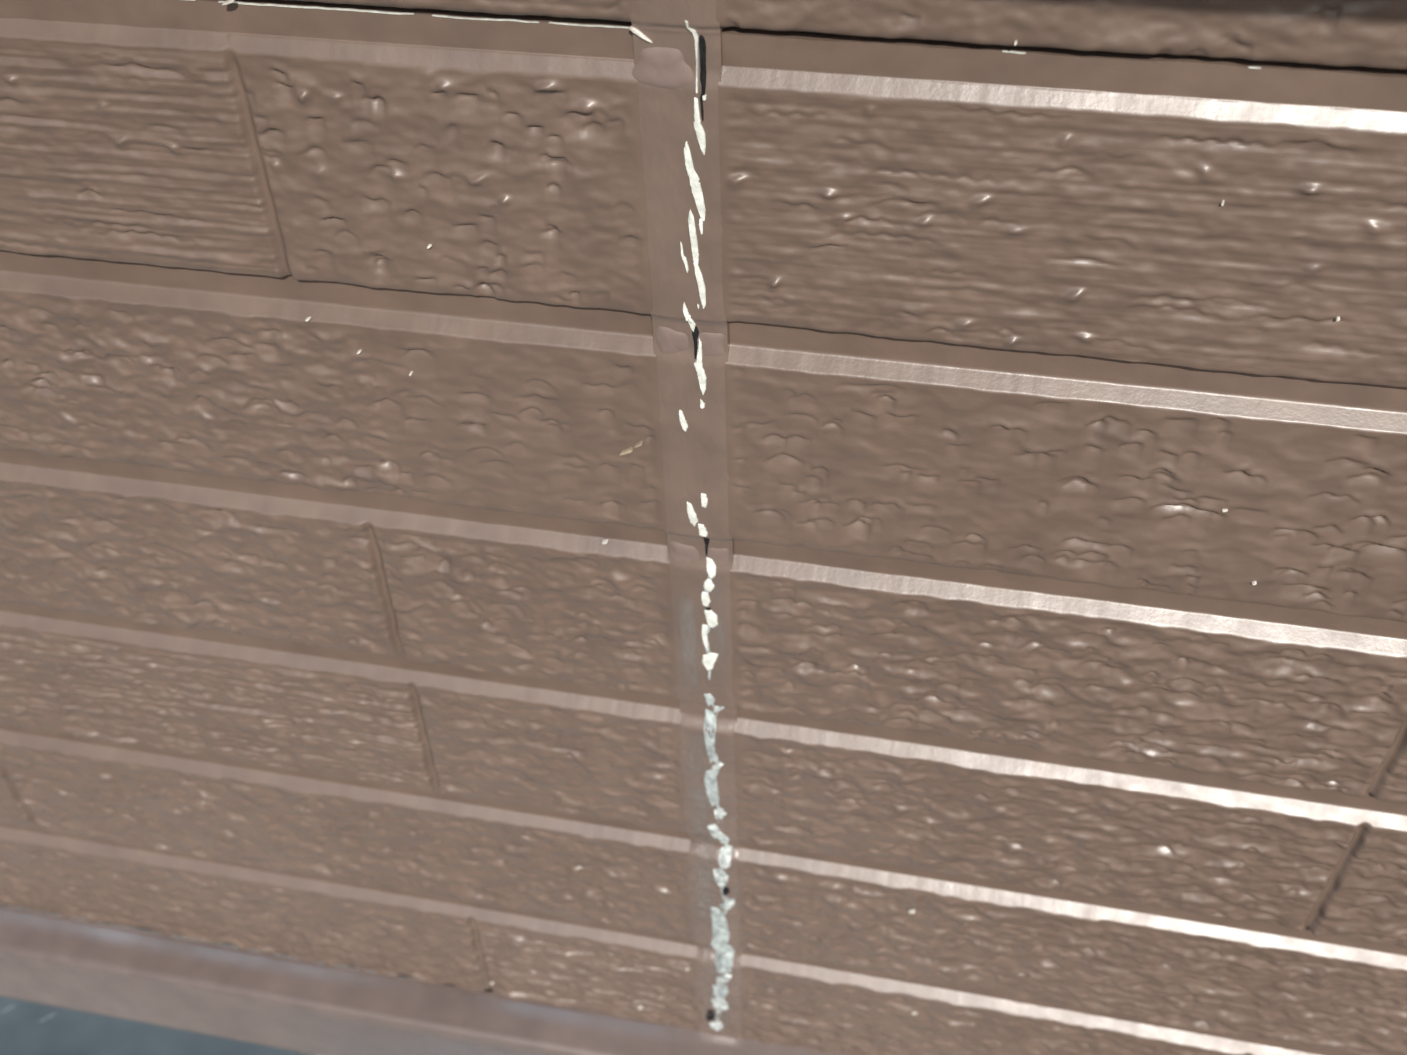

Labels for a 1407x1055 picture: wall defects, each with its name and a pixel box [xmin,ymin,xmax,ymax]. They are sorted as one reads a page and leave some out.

crack [192,0,629,28]
crack [898,36,961,44]
crack [1002,46,1293,69]
crack [1344,64,1407,72]
crack [679,20,850,432]
crack [687,493,735,1031]